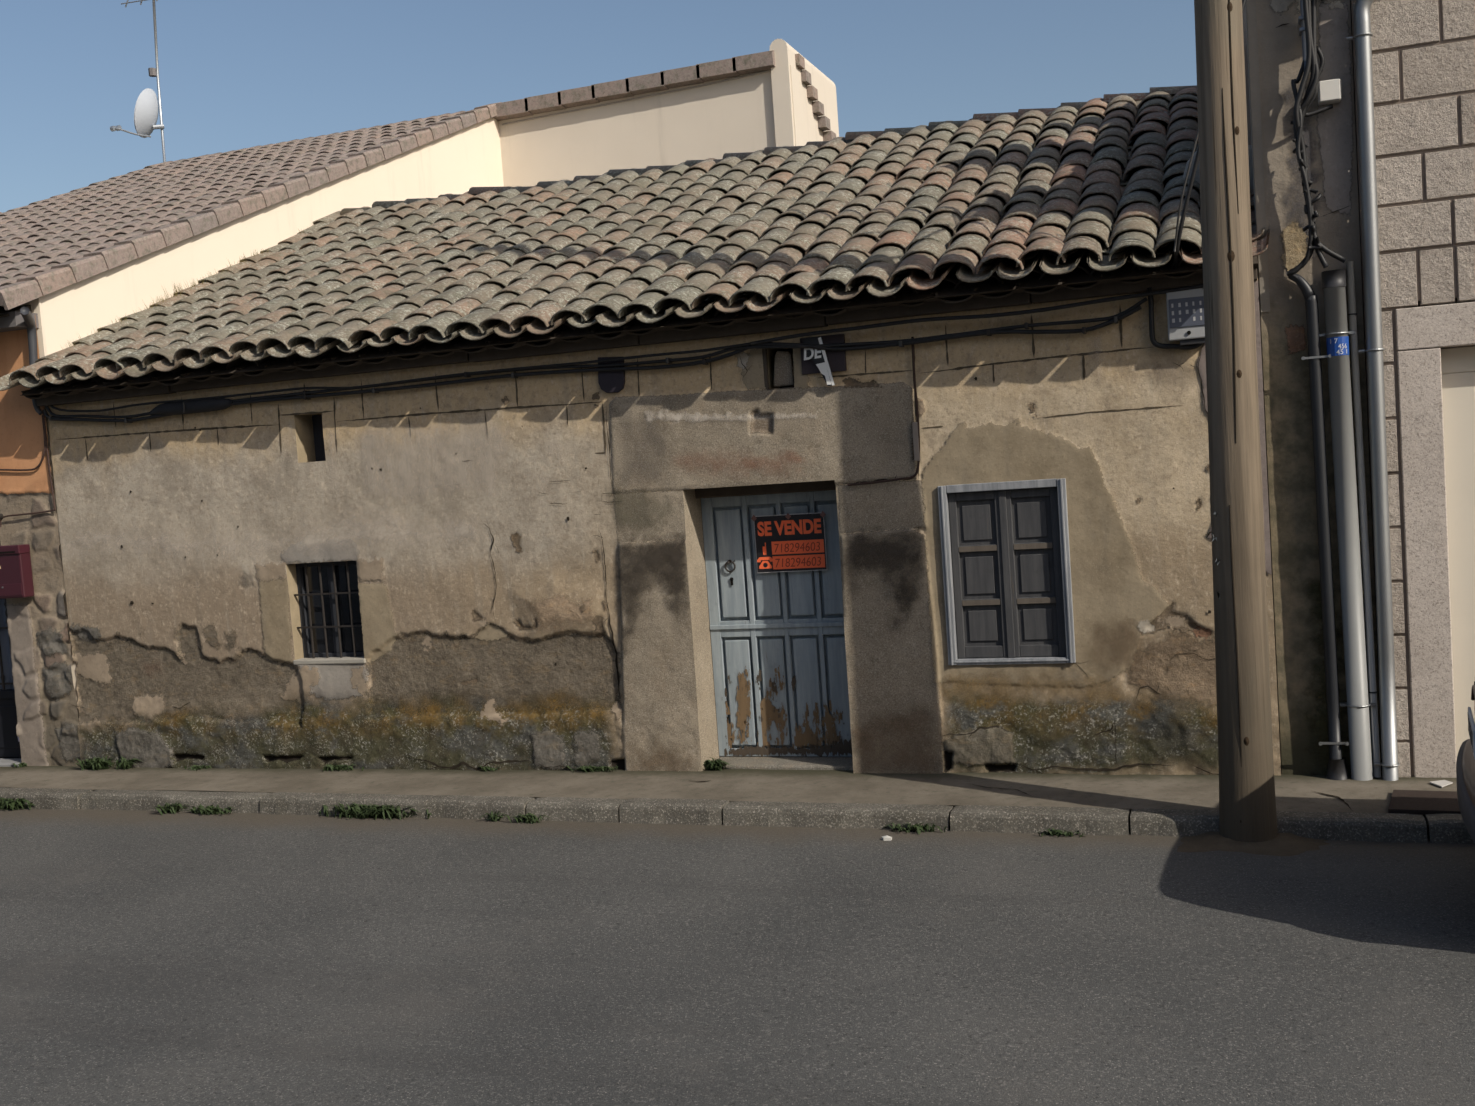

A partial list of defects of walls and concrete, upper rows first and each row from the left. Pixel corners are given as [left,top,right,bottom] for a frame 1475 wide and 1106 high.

damp [622,545,684,612]
peeling [203,625,237,651]
peeling [422,610,485,652]
flaking render [1138,603,1212,640]
flaking render [36,623,141,702]
peeling [724,665,852,757]
flaking render [116,726,174,768]